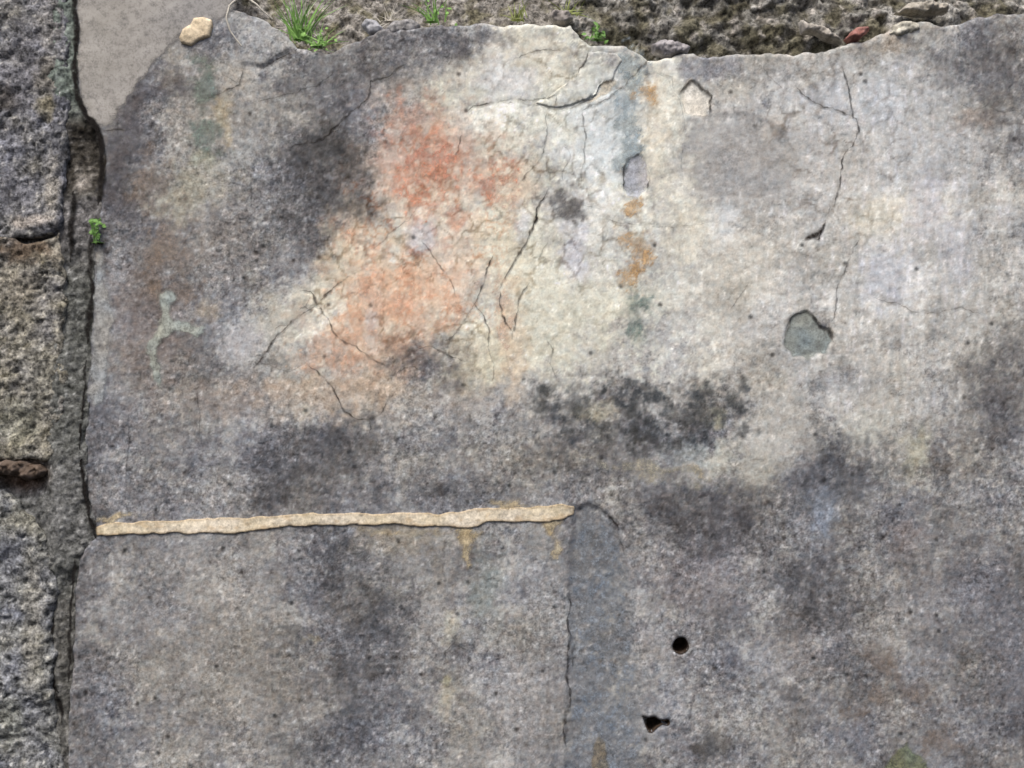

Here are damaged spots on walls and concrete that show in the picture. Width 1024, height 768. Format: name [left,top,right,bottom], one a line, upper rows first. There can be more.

crack [296,66,402,145]
spalling [681,78,712,116]
spalling [624,156,648,197]
crack [799,74,860,240]
crack [472,192,547,338]
crack [258,282,401,373]
spalling [784,310,832,359]
leakage [533,385,611,443]
leakage [617,380,750,482]